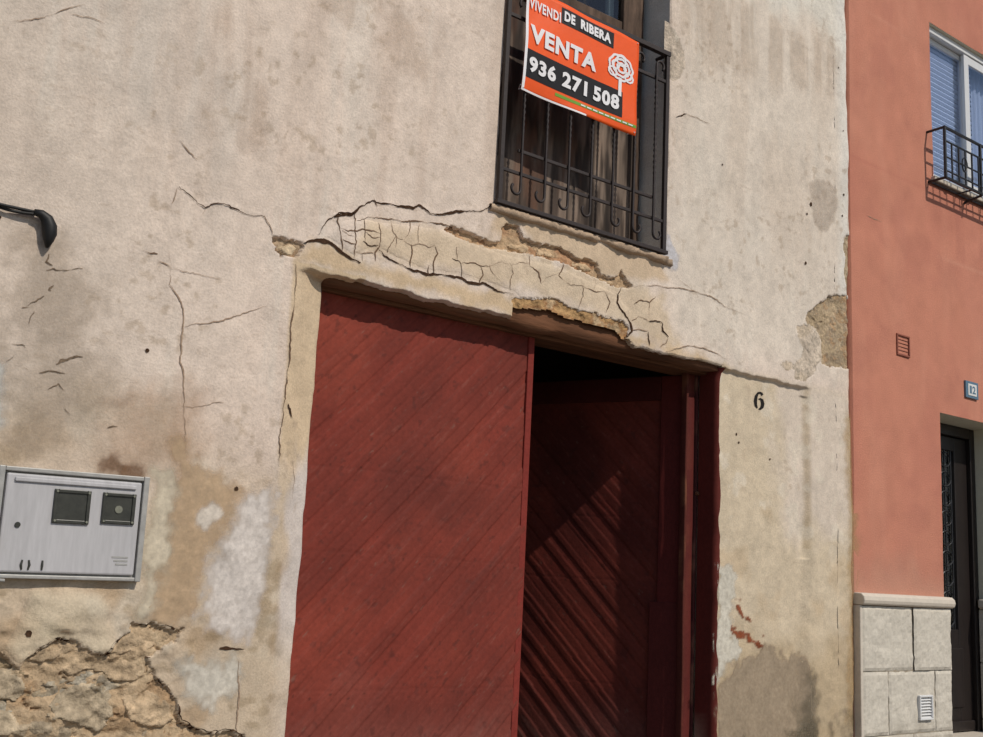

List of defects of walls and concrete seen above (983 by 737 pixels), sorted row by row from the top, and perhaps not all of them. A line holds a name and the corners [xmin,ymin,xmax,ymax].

crack [146,246,263,442]
crack [279,273,297,498]
crack [305,199,744,356]
flaking render [444,225,628,288]
flaking render [512,298,628,340]
flaking render [781,236,848,381]
flaking render [0,437,243,737]
peeling [731,605,764,648]